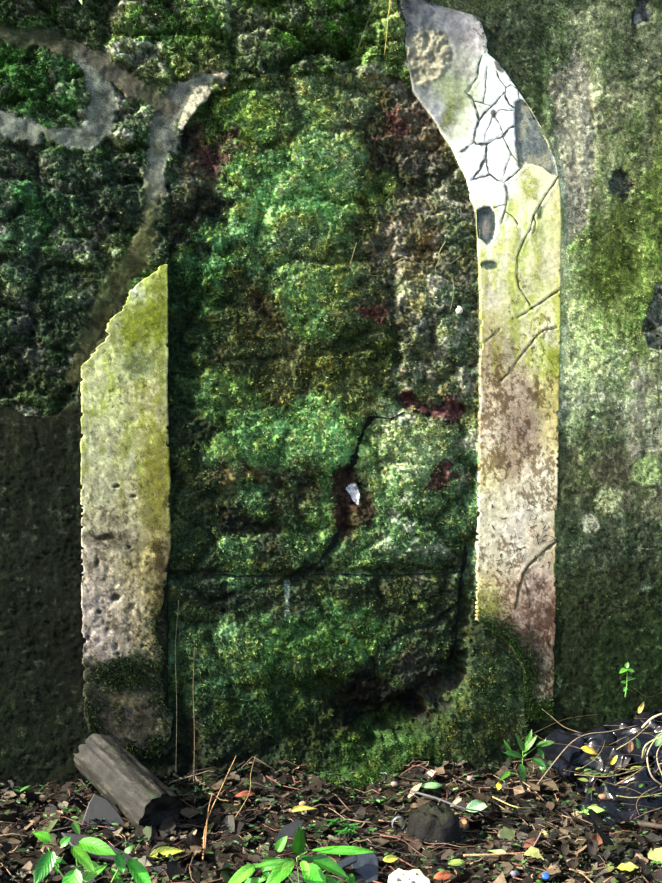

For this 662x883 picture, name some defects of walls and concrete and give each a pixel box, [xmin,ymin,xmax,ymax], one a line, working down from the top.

peeling [514,45,597,248]
crack [460,55,560,318]
spalling [609,169,633,199]
spalling [476,206,496,245]
spalling [480,261,497,270]
spalling [643,283,662,351]
crack [500,327,557,382]
spalling [399,388,467,429]
crack [349,412,404,470]
spalling [423,459,460,494]